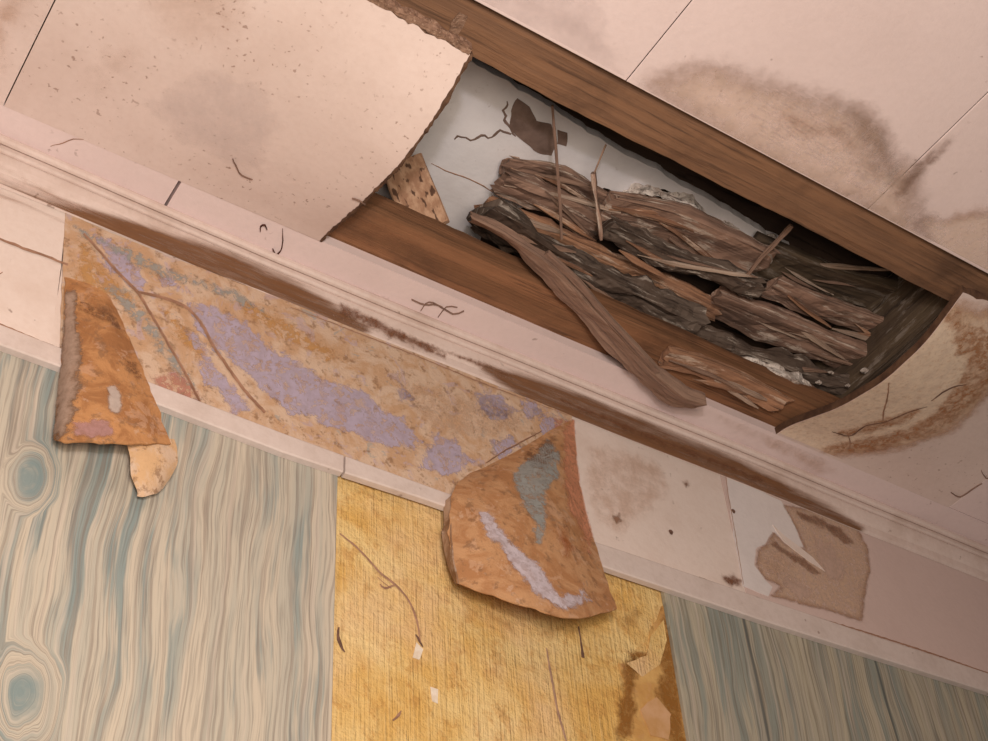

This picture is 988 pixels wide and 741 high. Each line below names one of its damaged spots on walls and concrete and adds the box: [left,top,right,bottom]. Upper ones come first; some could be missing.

peeling [454,98,568,156]
leakage [780,305,988,455]
peeling [727,478,825,596]